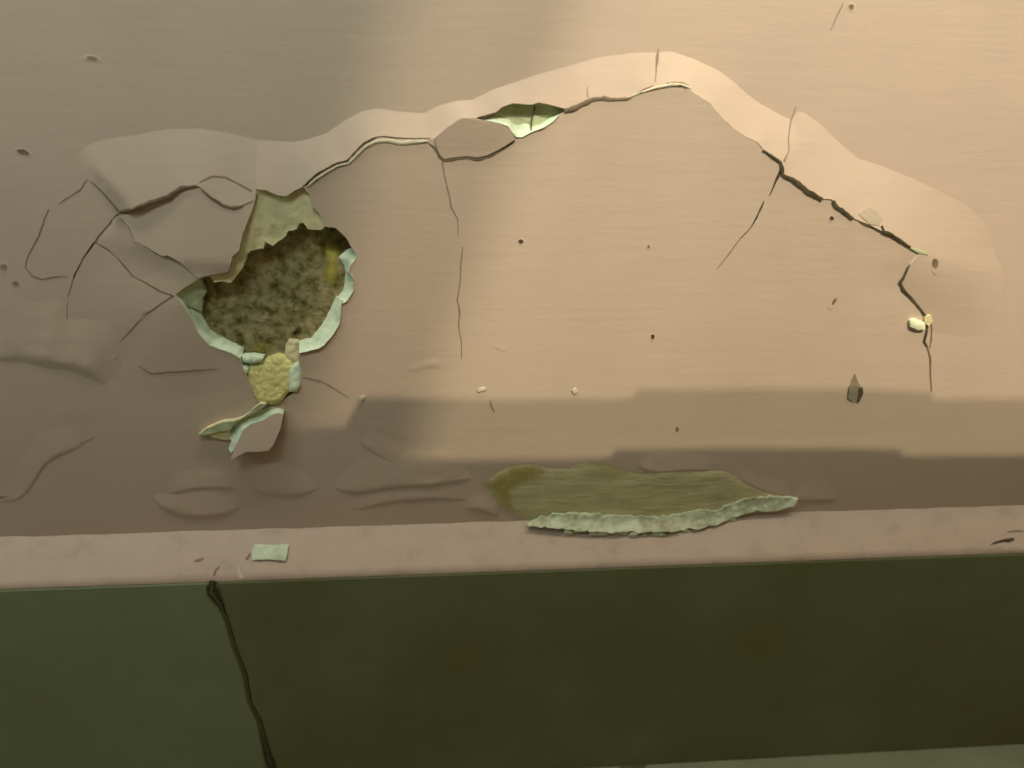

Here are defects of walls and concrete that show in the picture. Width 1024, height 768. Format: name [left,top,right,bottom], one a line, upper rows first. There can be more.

crack [303,136,515,221]
peeling [435,102,564,159]
crack [564,49,691,112]
crack [25,175,251,343]
spalling [177,187,356,460]
crack [456,247,464,359]
crack [717,107,933,392]
crack [303,377,348,398]
spalling [483,463,798,537]
crack [207,580,276,768]